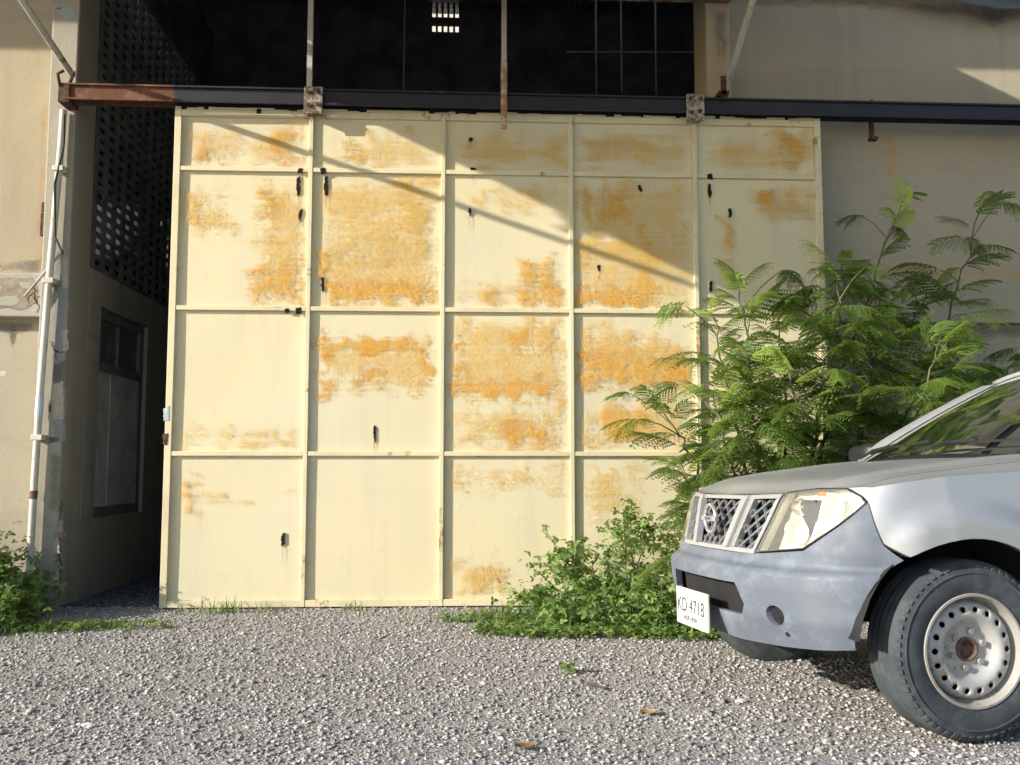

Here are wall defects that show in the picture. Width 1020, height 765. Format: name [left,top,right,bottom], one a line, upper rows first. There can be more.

corrosion [704,127,816,293]
spalling [0,277,38,311]
peeling [50,249,70,440]
corrosion [443,549,511,599]